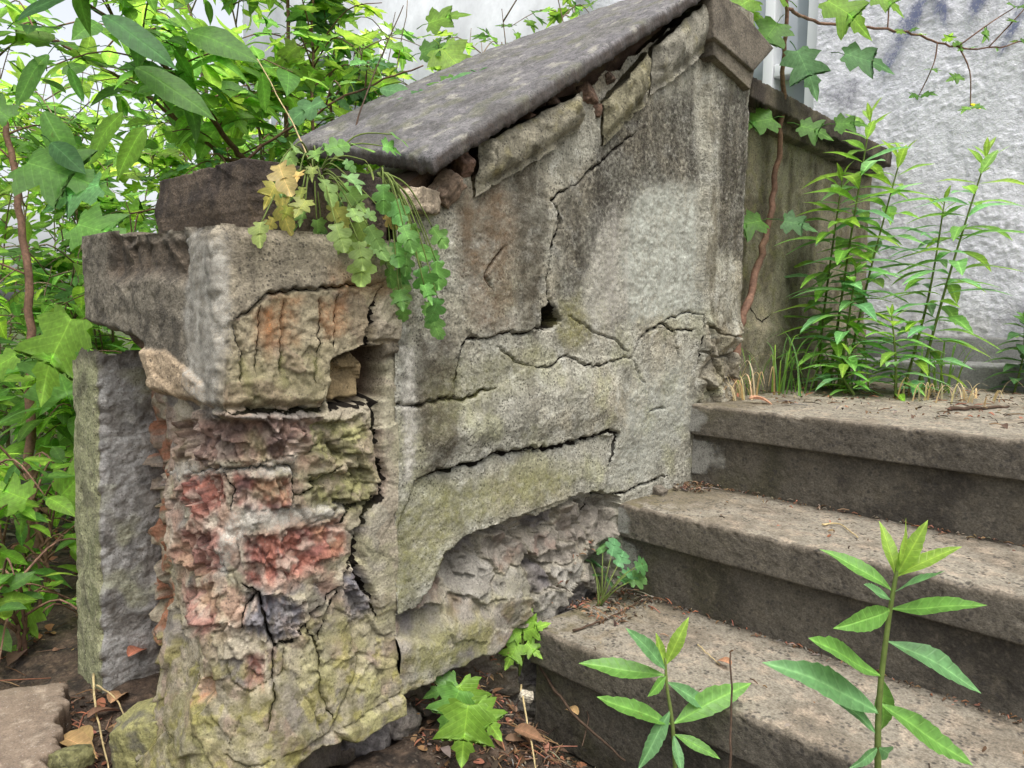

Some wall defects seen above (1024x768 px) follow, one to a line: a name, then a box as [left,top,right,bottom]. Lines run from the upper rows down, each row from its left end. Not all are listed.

crack [550,132,636,248]
spalling [95,277,622,768]
crack [228,273,704,729]